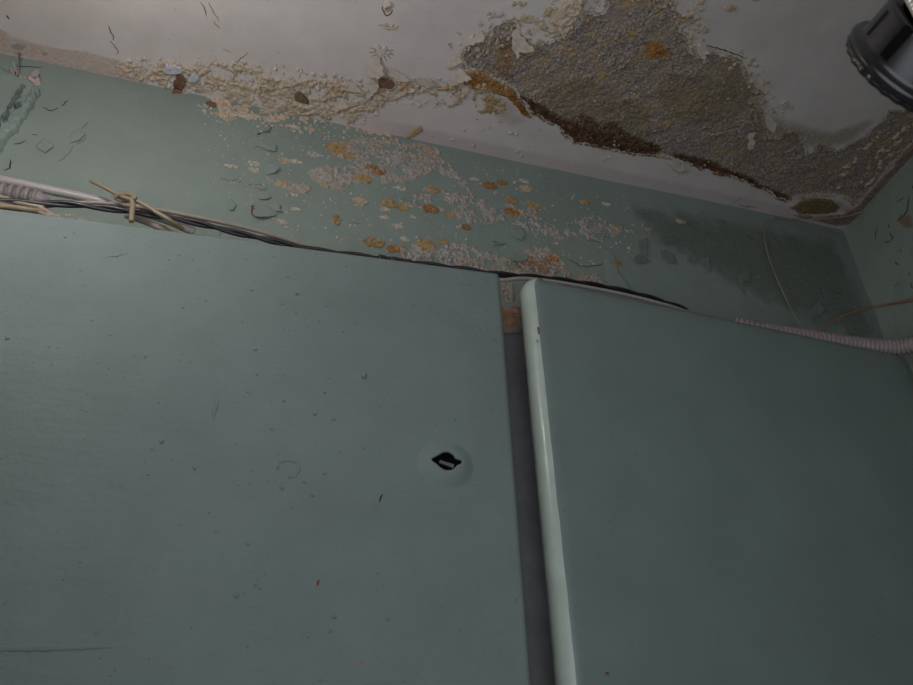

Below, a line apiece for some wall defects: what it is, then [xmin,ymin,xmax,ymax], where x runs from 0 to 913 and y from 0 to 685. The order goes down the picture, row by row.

spalling [0,0,913,226]
corrosion [463,70,660,157]